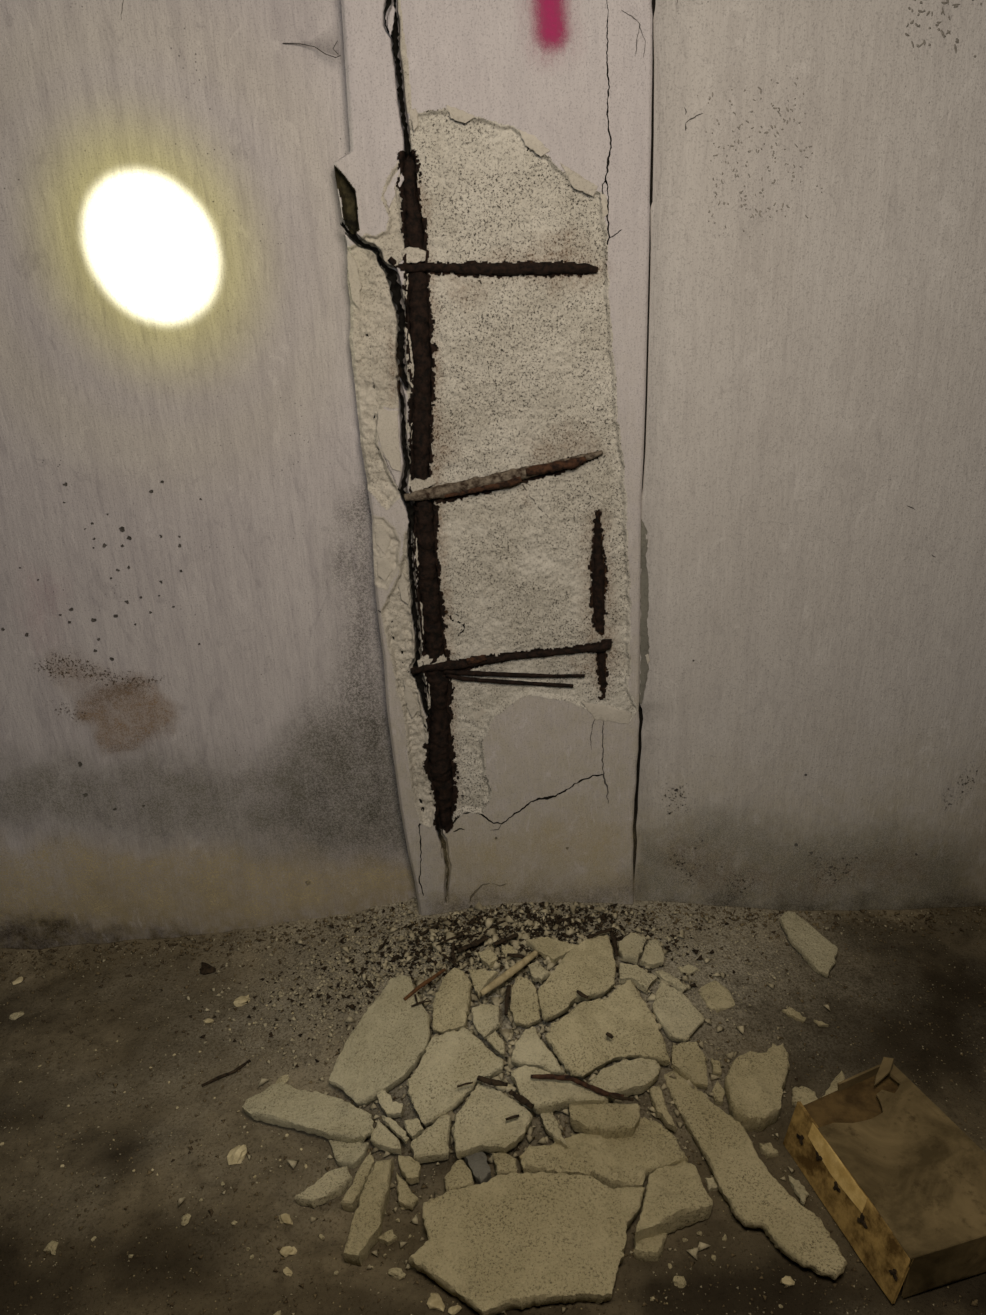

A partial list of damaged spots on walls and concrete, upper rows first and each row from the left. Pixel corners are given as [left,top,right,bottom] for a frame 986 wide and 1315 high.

crack [384,0,412,160]
crack [602,0,678,490]
spalling [334,105,650,828]
corrosion [444,456,587,498]
corrosion [466,655,487,664]
crack [416,703,643,903]